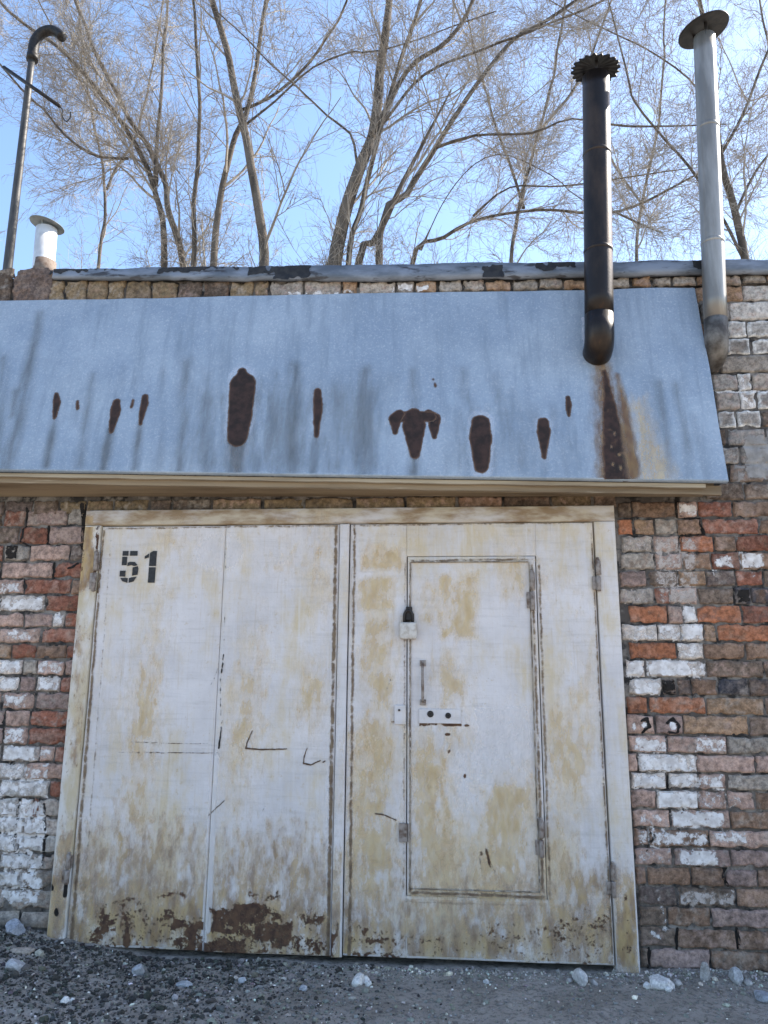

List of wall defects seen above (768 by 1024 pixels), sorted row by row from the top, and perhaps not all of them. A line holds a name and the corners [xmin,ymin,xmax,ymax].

corrosion [45,392,61,467]
corrosion [101,394,149,470]
corrosion [227,368,256,473]
corrosion [313,388,323,438]
corrosion [388,408,441,474]
corrosion [469,415,492,473]
corrosion [536,418,551,459]
corrosion [596,364,664,482]
corrosion [47,516,639,973]